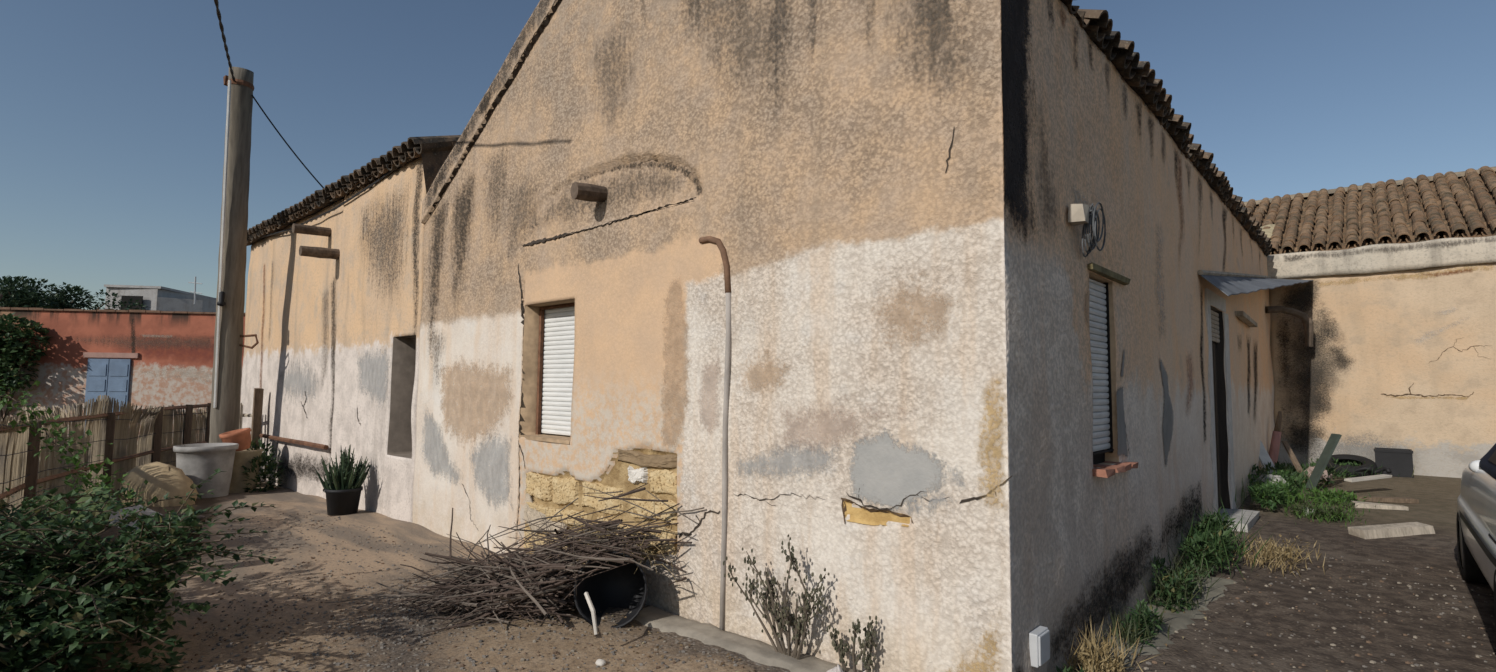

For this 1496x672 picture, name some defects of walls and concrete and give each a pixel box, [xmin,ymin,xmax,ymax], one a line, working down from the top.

damp [362,0,549,335]
damp [580,162,701,194]
damp [1001,0,1035,241]
damp [1048,0,1242,268]
spalling [523,282,688,564]
crack [676,476,1012,538]
spalling [841,498,913,527]
damp [1051,484,1203,662]
damp [1247,340,1258,422]
damp [1279,281,1387,462]
crack [1383,337,1492,400]